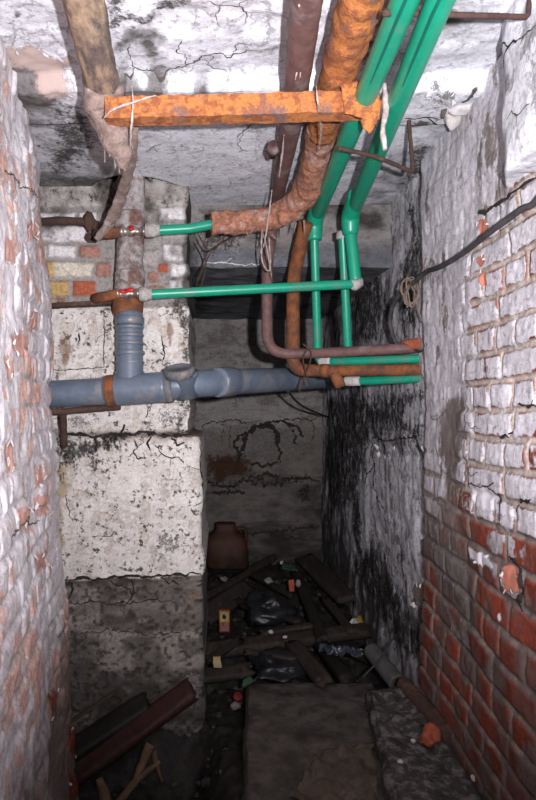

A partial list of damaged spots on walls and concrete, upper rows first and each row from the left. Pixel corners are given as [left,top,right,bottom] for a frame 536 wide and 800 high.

flaking render [6,45,75,101]
crack [122,0,263,86]
crack [58,394,321,642]
leakage [325,378,426,667]
spalling [468,547,524,612]